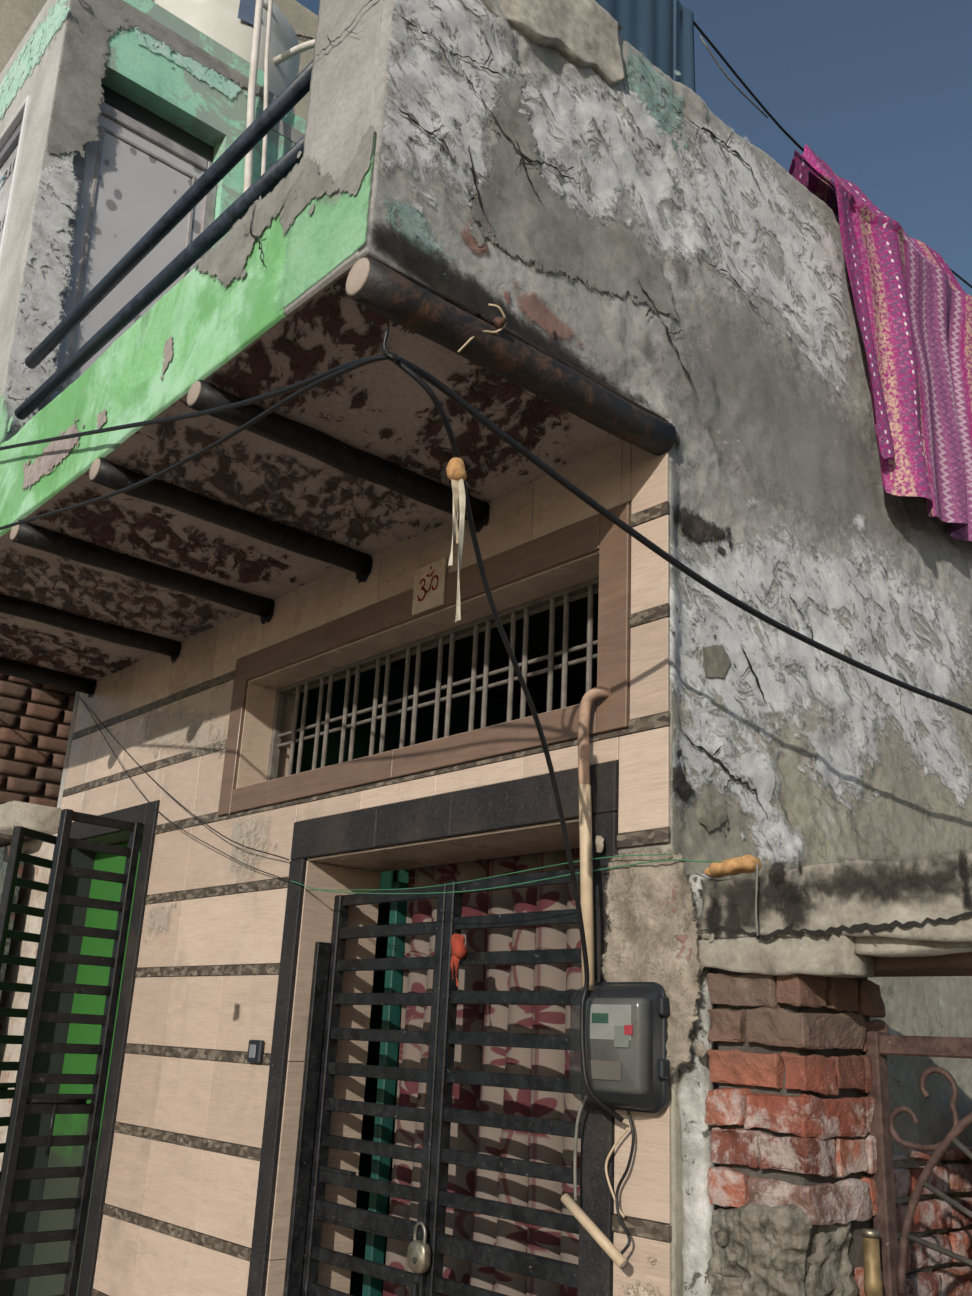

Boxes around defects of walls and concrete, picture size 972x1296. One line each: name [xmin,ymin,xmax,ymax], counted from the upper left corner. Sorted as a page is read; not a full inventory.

flaking render [47,0,277,158]
crack [245,202,264,263]
peeling [194,0,855,418]
peeling [160,336,173,379]
corrosion [372,223,648,404]
crack [637,278,699,401]
peeling [22,409,107,490]
peeling [118,420,443,553]
peeling [387,360,574,502]
peeling [662,505,972,865]
crack [699,912,972,941]
water stain [704,850,972,939]